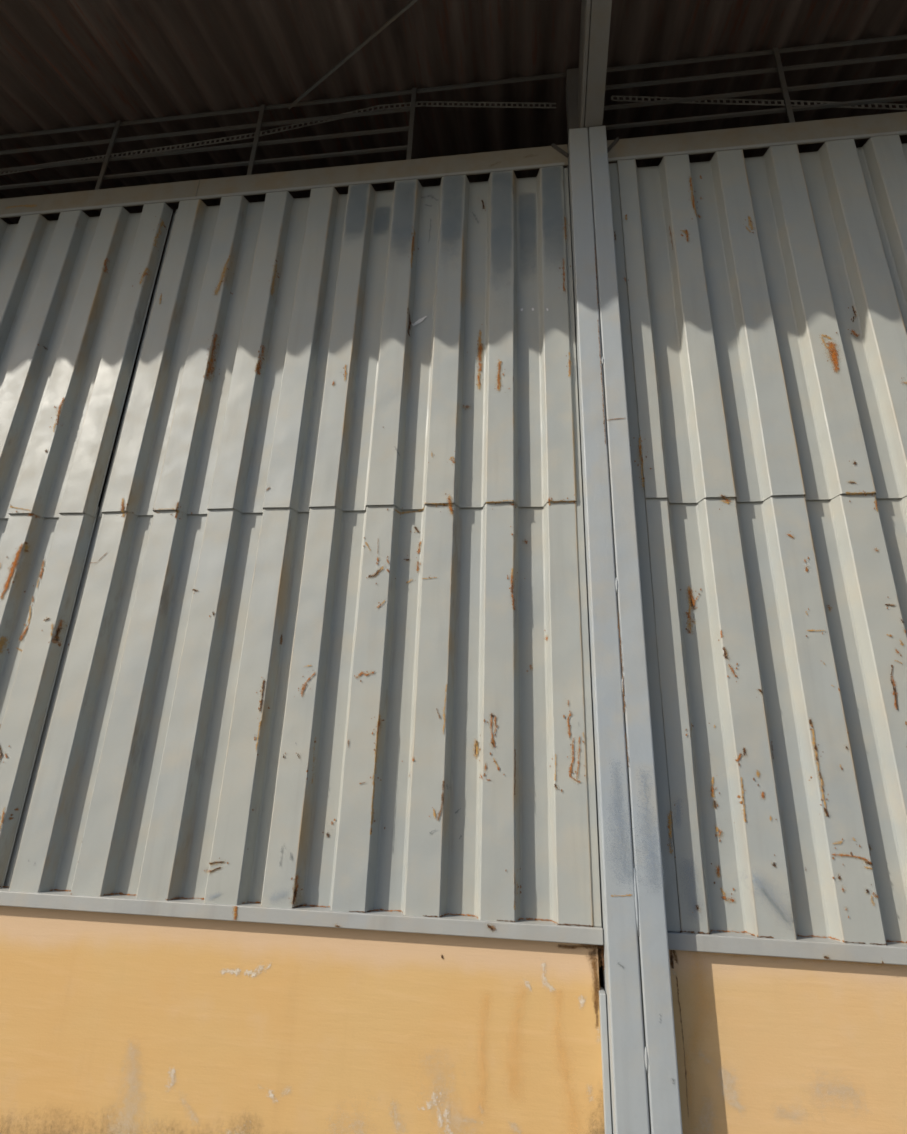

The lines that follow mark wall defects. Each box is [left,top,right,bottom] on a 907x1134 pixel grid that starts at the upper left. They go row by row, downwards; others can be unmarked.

rust [203,334,220,382]
rust [819,334,840,373]
rust [0,542,30,599]
rust [45,617,69,647]
rust [680,585,702,635]
rust [472,713,516,795]
rust [550,700,585,792]
rust [809,719,829,817]
rust [832,837,873,892]
rust [797,934,907,945]